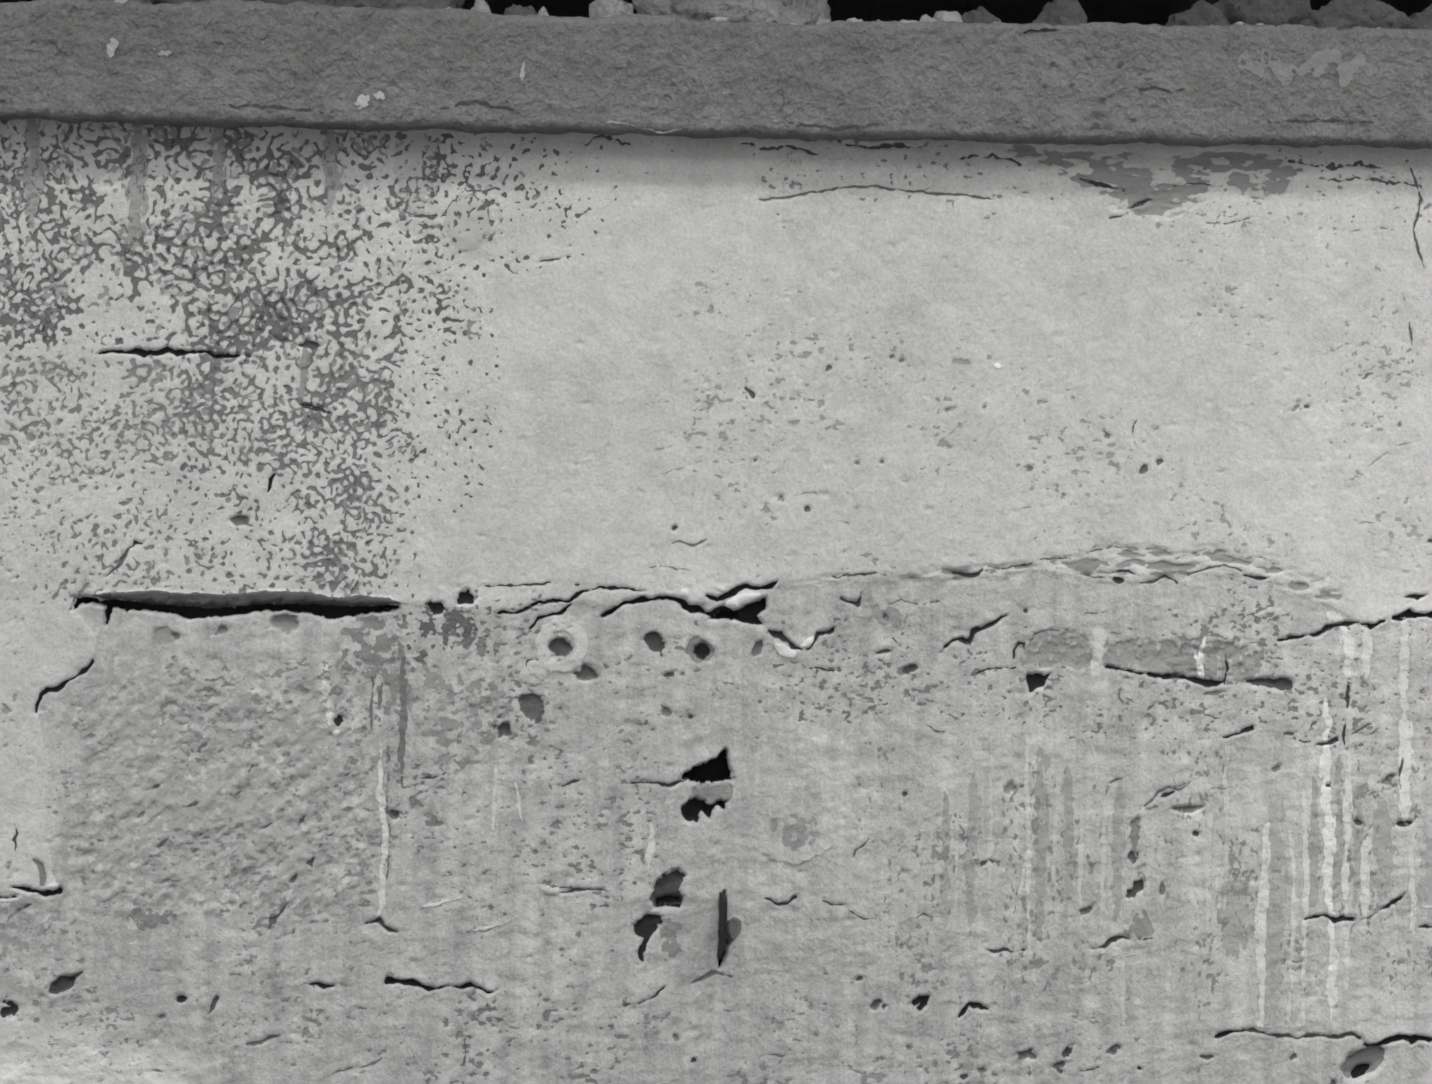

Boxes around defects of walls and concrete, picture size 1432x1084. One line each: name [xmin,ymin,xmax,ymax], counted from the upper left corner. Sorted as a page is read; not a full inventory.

crack [1,659,94,713]
crack [484,538,777,666]
crack [768,546,1272,716]
crack [1105,594,1432,746]
crack [0,829,63,930]
spalling [692,782,733,802]
spalling [727,917,742,941]
leakage [920,736,995,936]
leakage [1011,734,1155,1026]
leakage [1203,610,1432,1028]
crack [309,976,494,1084]
crack [1198,1028,1432,1073]